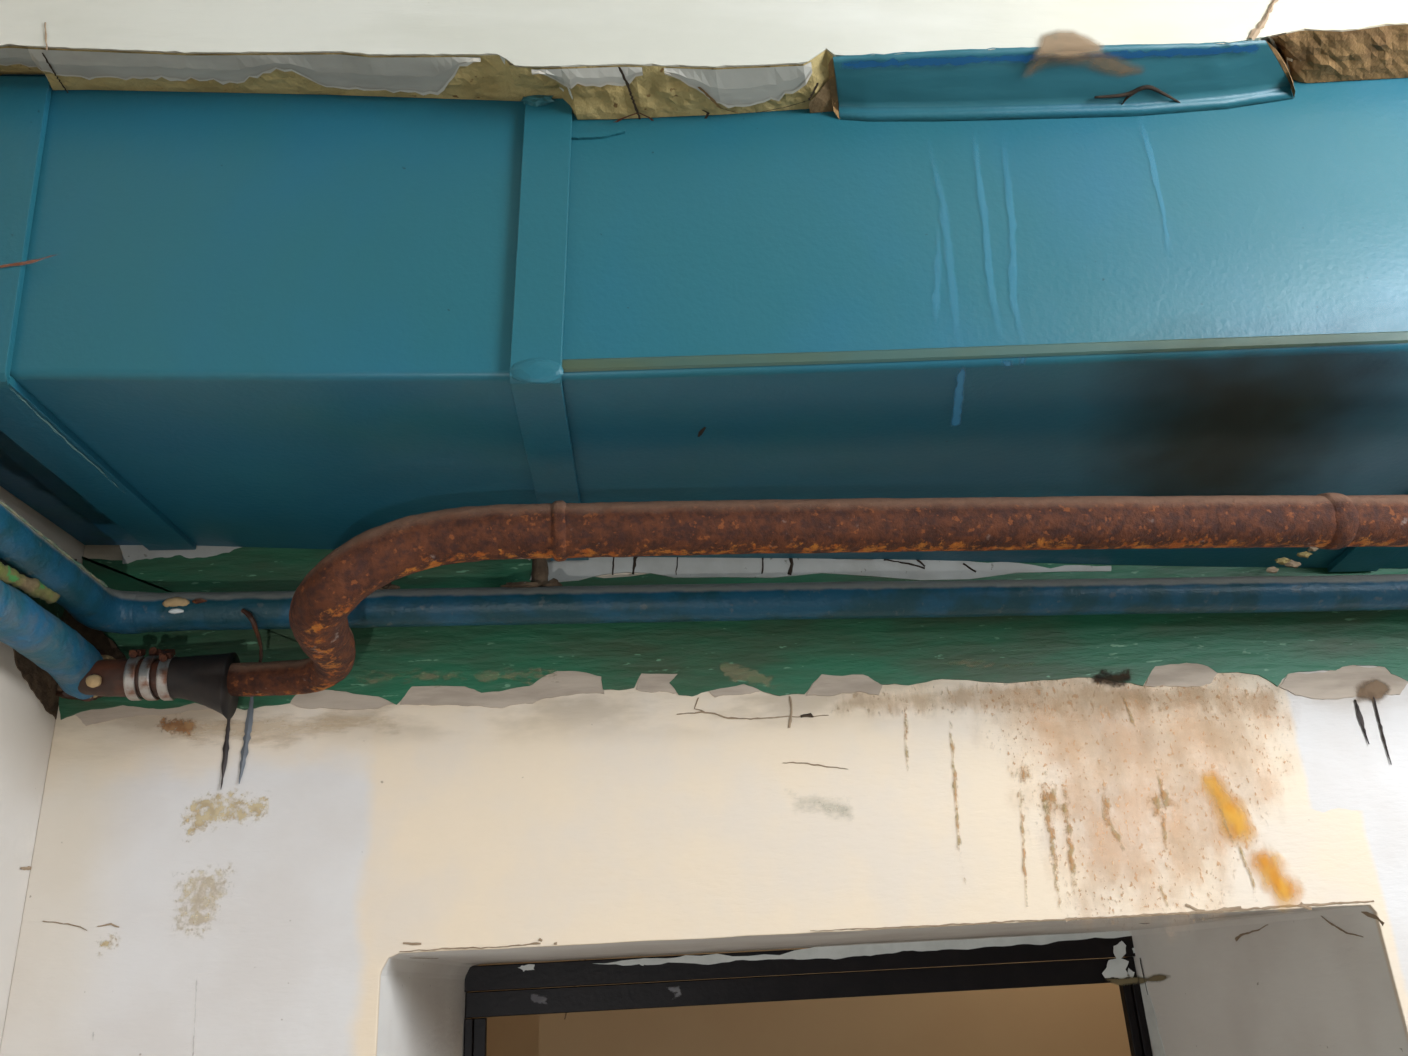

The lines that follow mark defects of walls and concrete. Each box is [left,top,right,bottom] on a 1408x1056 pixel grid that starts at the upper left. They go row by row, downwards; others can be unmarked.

spalling [1270,25,1408,83]
spalling [0,46,839,122]
peeling [119,545,240,564]
spalling [12,648,210,726]
peeling [290,671,604,710]
peeling [806,674,883,696]
peeling [1279,665,1408,700]
rust [158,717,195,735]
leakage [185,794,265,833]
leakage [950,734,961,845]
leakage [986,669,1284,913]
rust [1204,775,1295,902]